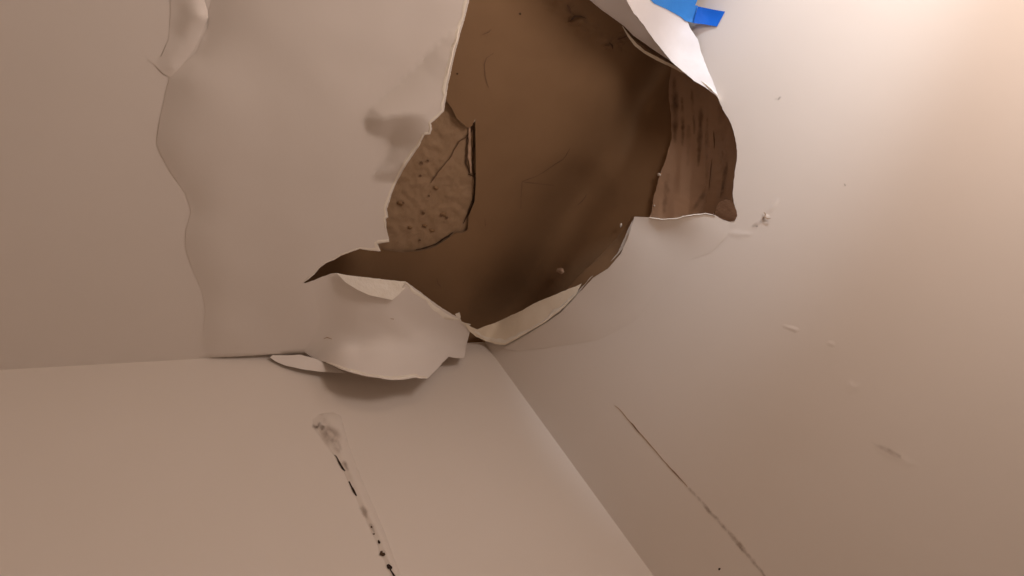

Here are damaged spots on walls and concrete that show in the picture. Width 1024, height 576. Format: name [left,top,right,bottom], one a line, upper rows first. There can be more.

peeling [156,0,737,380]
crack [312,412,400,576]
crack [615,406,687,486]